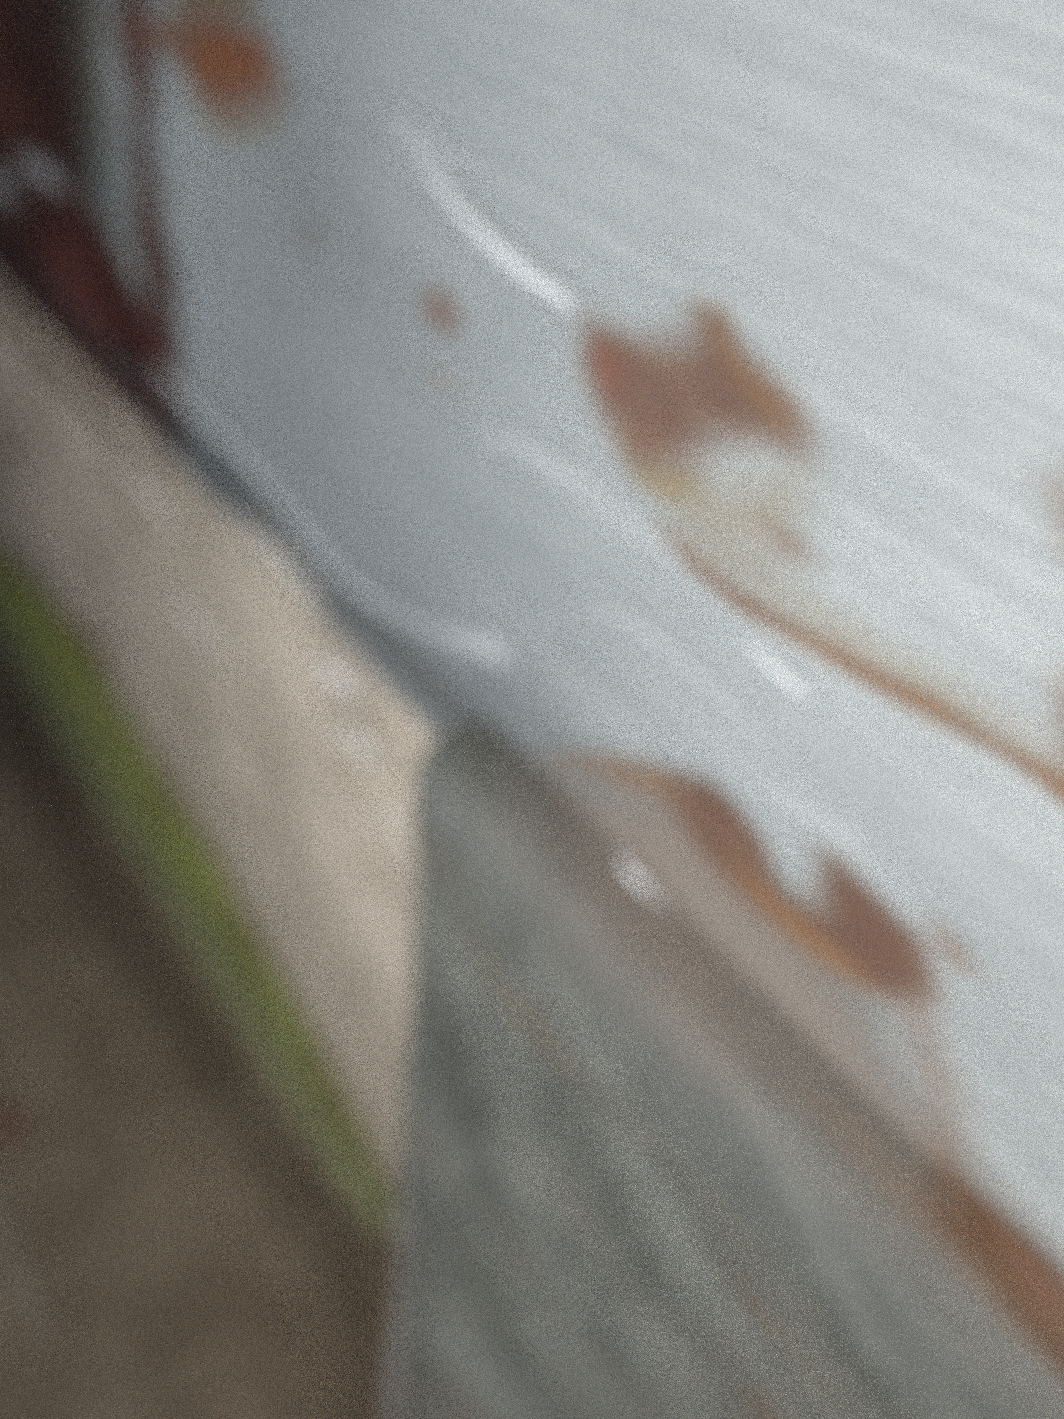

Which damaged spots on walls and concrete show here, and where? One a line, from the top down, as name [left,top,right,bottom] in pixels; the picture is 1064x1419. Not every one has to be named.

rust [0,0,271,446]
rust [592,323,786,491]
rust [679,548,956,722]
rust [986,740,1064,797]
rust [598,763,922,990]
rust [887,1164,1064,1365]